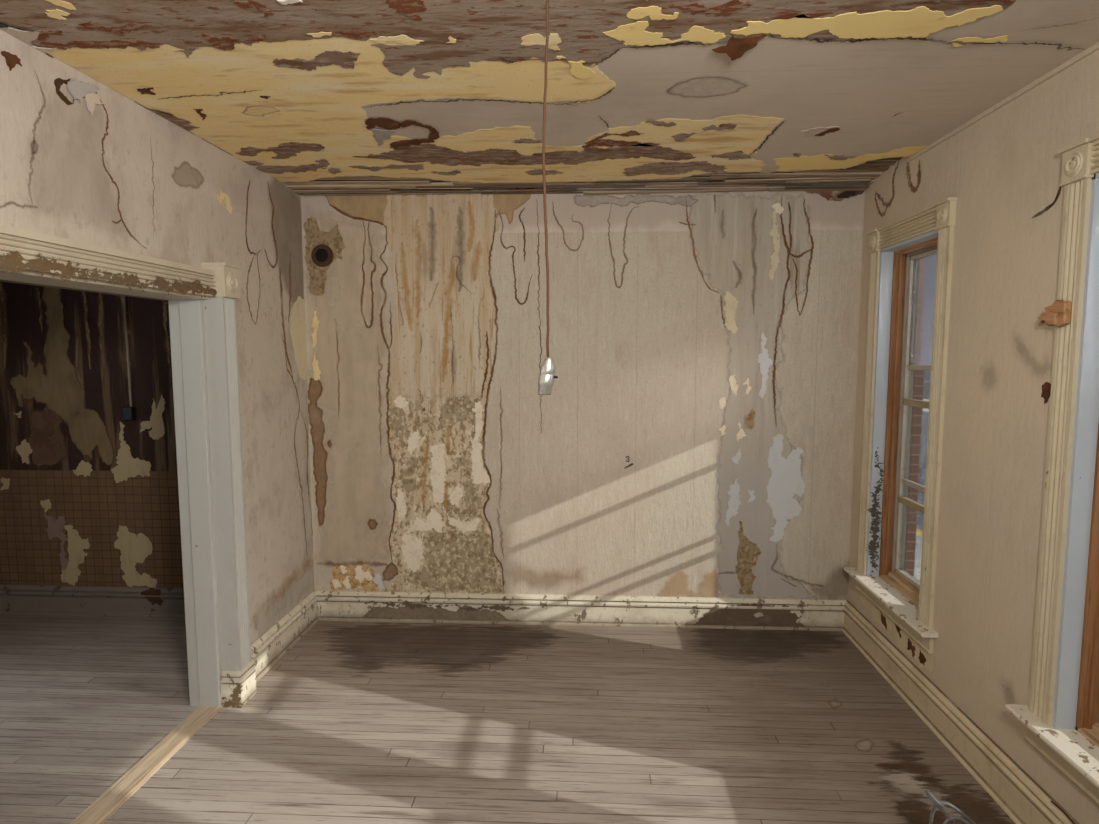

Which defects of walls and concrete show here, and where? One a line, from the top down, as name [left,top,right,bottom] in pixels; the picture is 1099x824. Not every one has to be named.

flaking render [603,5,1008,47]
peeling [0,250,217,298]
crack [96,92,147,249]
water stain [322,188,534,328]
flaking render [42,37,927,627]
crack [772,199,814,426]
crack [837,190,865,198]
crack [1034,186,1062,217]